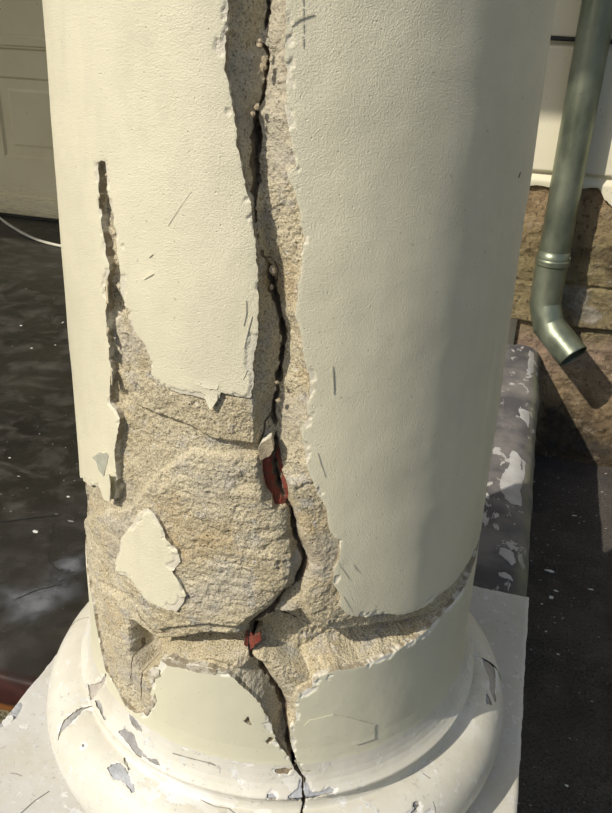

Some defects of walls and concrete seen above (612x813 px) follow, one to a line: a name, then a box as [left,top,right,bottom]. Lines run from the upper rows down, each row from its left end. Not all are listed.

flaking render [60,0,384,765]
crack [248,0,309,813]
flaking render [511,185,612,467]
spalling [0,702,23,727]
peeling [108,758,135,793]
peeling [275,760,333,808]